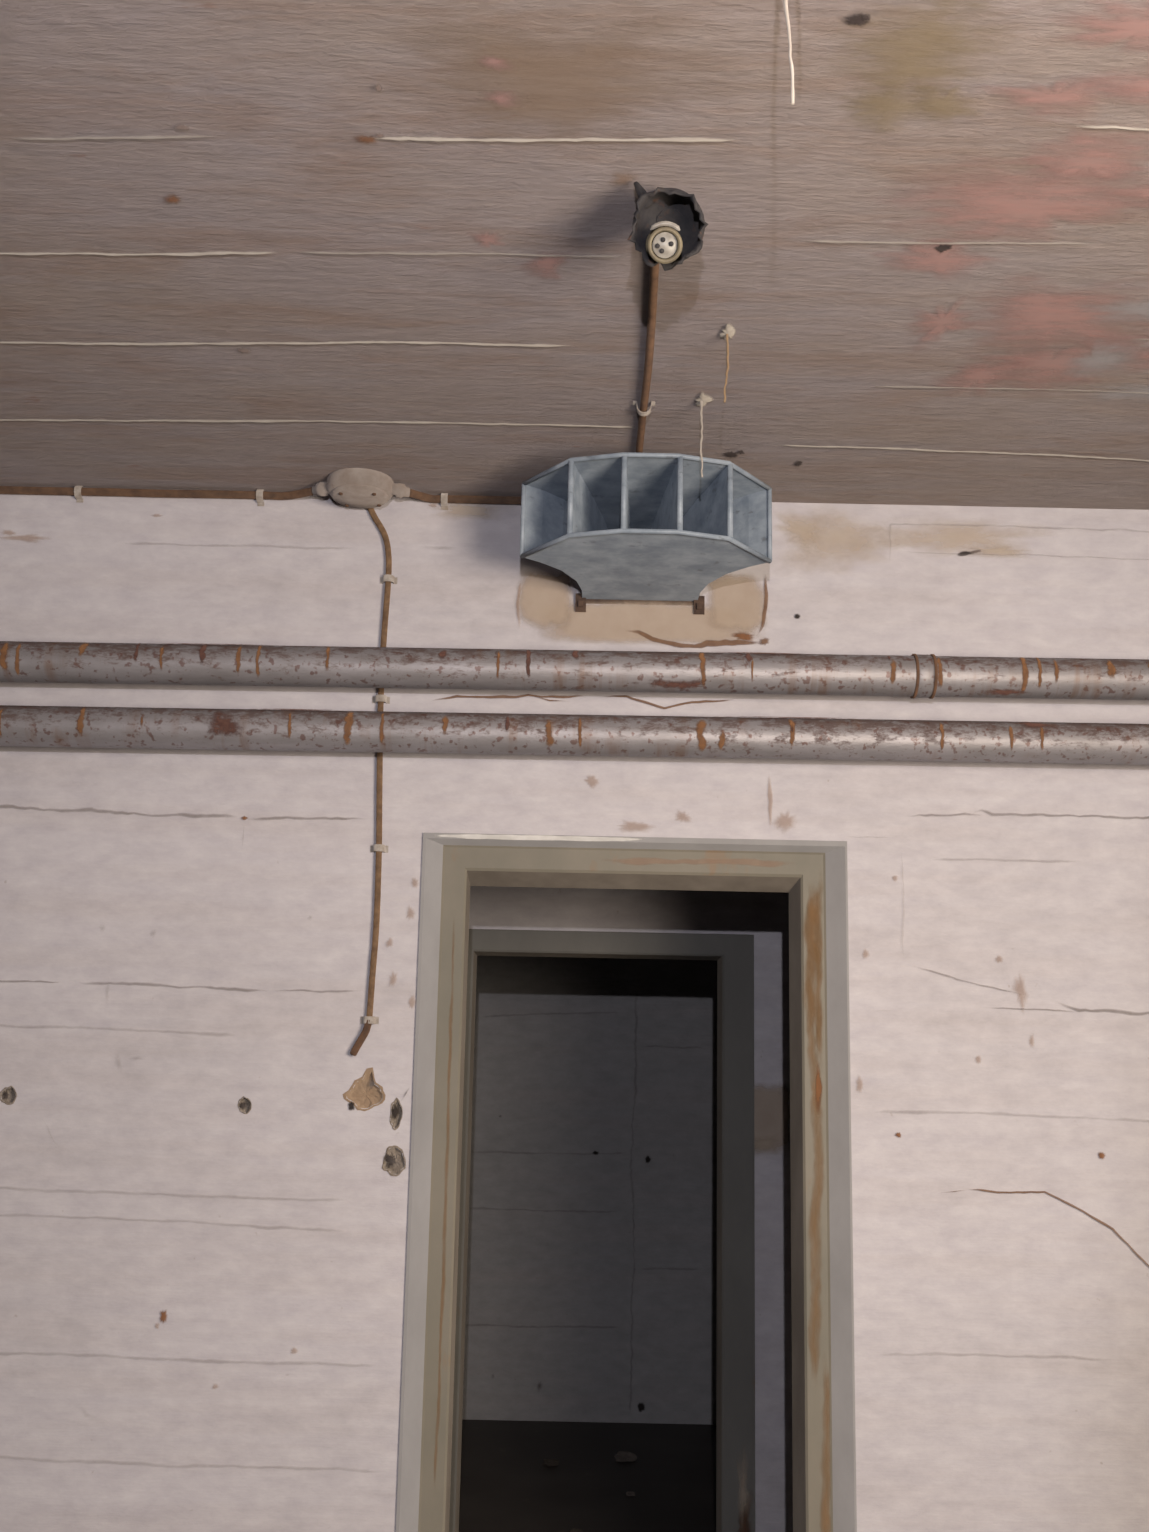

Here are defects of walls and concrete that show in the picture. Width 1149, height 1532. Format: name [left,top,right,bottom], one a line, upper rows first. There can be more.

rust [809,1001,822,1113]
spalling [343,1067,406,1176]
crack [953,1189,1149,1266]